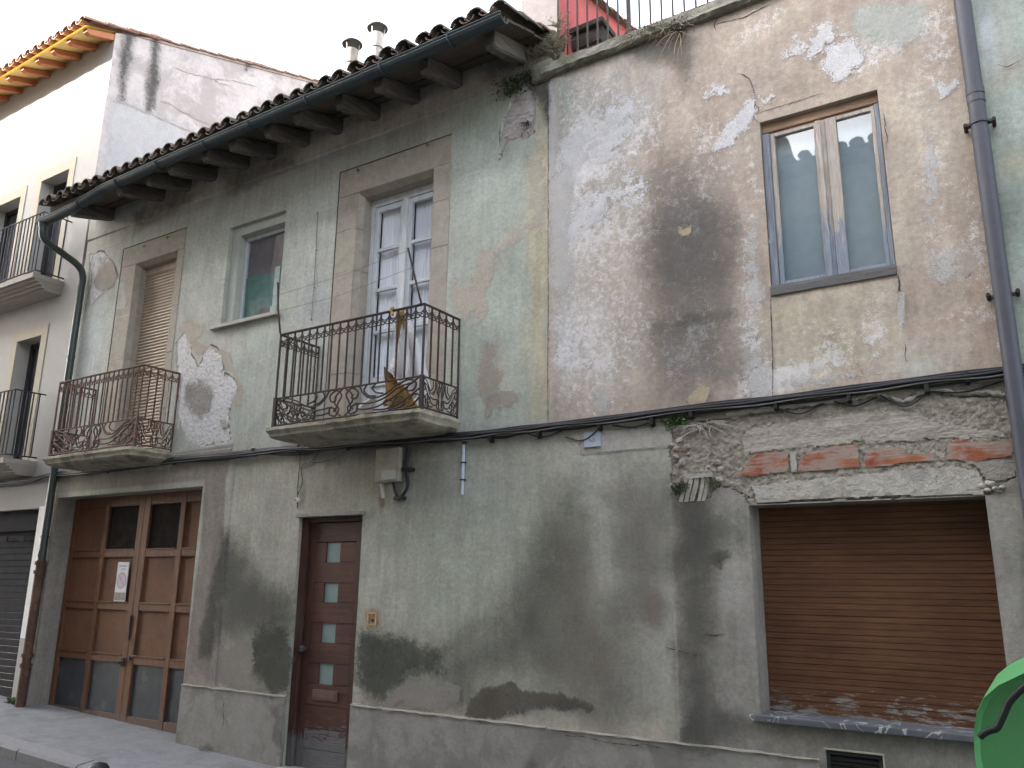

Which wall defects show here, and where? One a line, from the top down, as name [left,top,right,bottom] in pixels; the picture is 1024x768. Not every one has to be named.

water stain [119,30,135,100]
water stain [145,32,159,111]
spalling [501,88,535,155]
peeling [709,88,775,155]
crack [738,73,820,121]
peeling [780,18,868,83]
water stain [657,184,726,380]
spalling [177,321,245,445]
spalling [574,349,1017,504]
water stain [199,539,295,746]
water stain [353,569,550,703]
water stain [465,682,596,719]